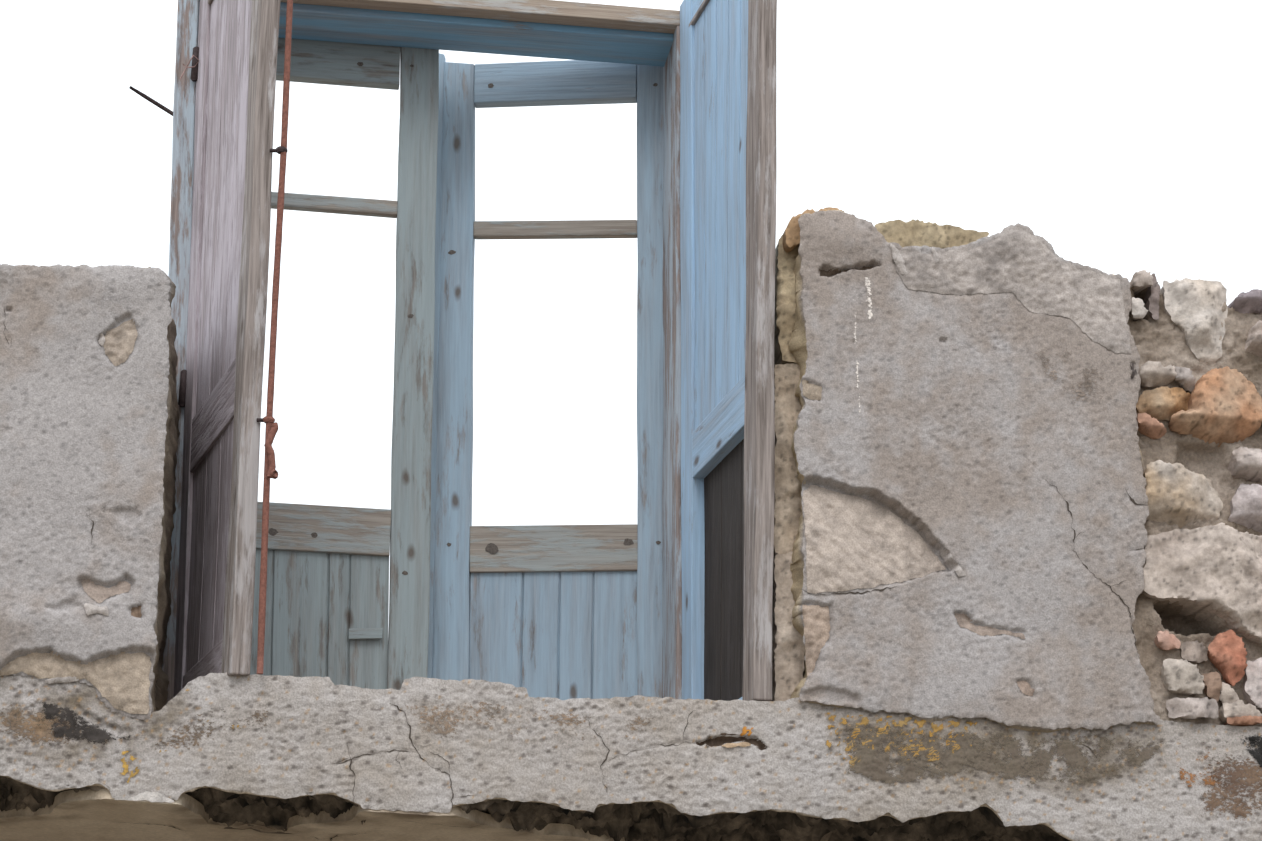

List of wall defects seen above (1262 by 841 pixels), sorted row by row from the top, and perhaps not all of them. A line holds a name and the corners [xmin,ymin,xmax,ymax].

spalling [818,266,874,277]
spalling [98,319,138,366]
spalling [81,579,131,616]
spalling [131,606,142,618]
spalling [802,485,966,676]
spalling [954,613,1025,639]
spalling [0,651,151,714]
crack [333,703,482,827]
hole [696,733,767,750]
leakage [1226,735,1262,767]